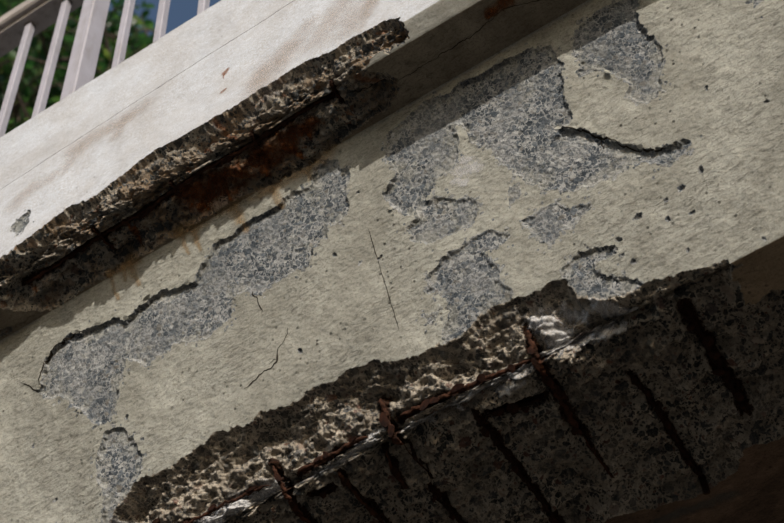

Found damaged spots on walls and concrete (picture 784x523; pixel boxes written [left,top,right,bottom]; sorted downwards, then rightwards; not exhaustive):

peeling [570,0,671,106]
rust [22,79,345,286]
spalling [0,17,410,429]
peeling [381,43,695,254]
crack [561,126,668,153]
crack [368,229,399,329]
crack [244,327,288,389]
spalling [90,226,784,523]
rust [377,319,615,523]
rust [183,433,372,523]
rust [306,468,392,523]